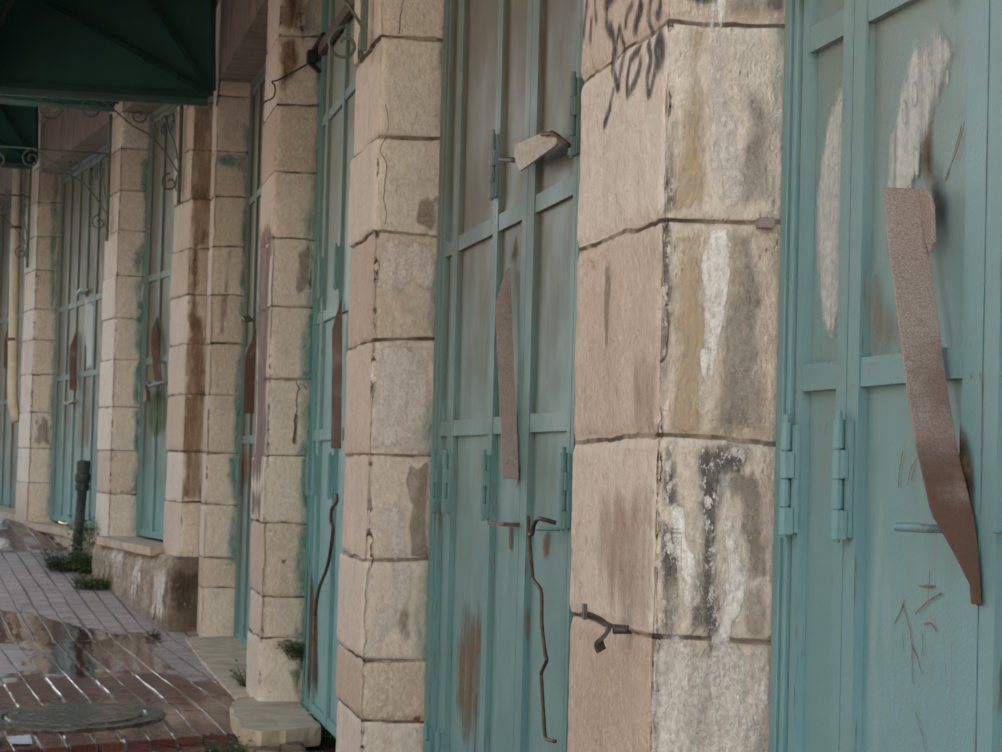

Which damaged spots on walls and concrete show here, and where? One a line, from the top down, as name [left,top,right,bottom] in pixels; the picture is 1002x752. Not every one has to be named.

crack [368,99,389,223]
rust [459,611,481,752]
water stain [655,473,768,752]